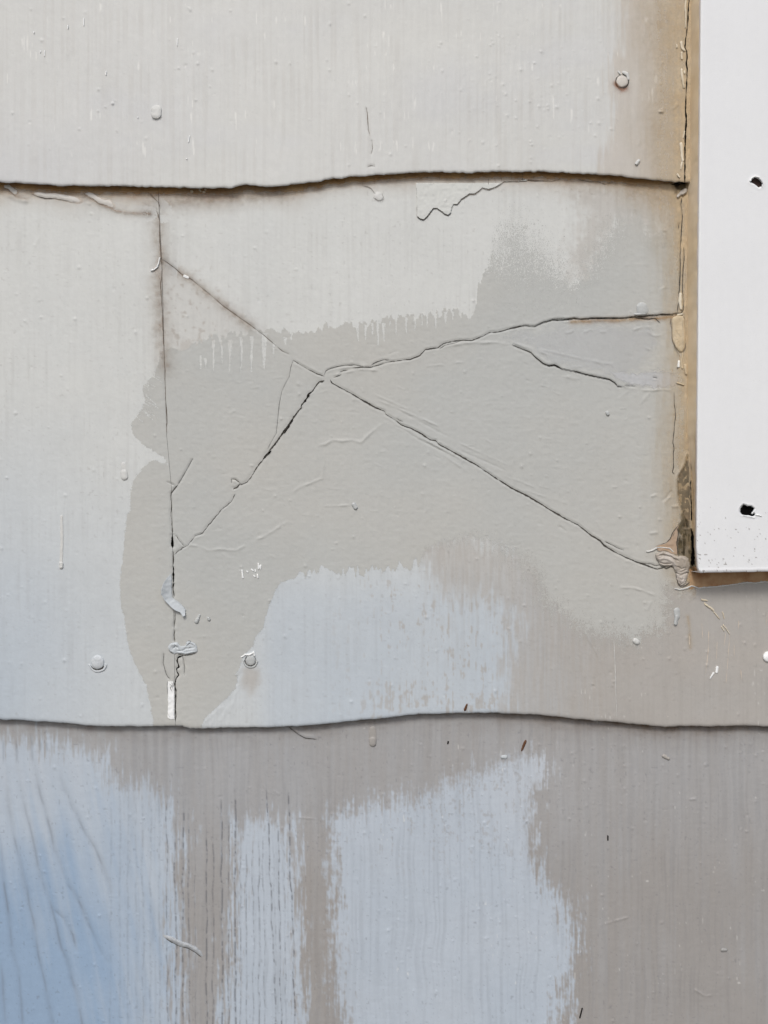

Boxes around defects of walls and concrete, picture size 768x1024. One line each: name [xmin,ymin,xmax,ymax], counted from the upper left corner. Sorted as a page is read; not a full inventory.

peeling [416,179,559,220]
crack [148,0,690,597]
crack [672,403,695,566]
crack [163,622,185,721]